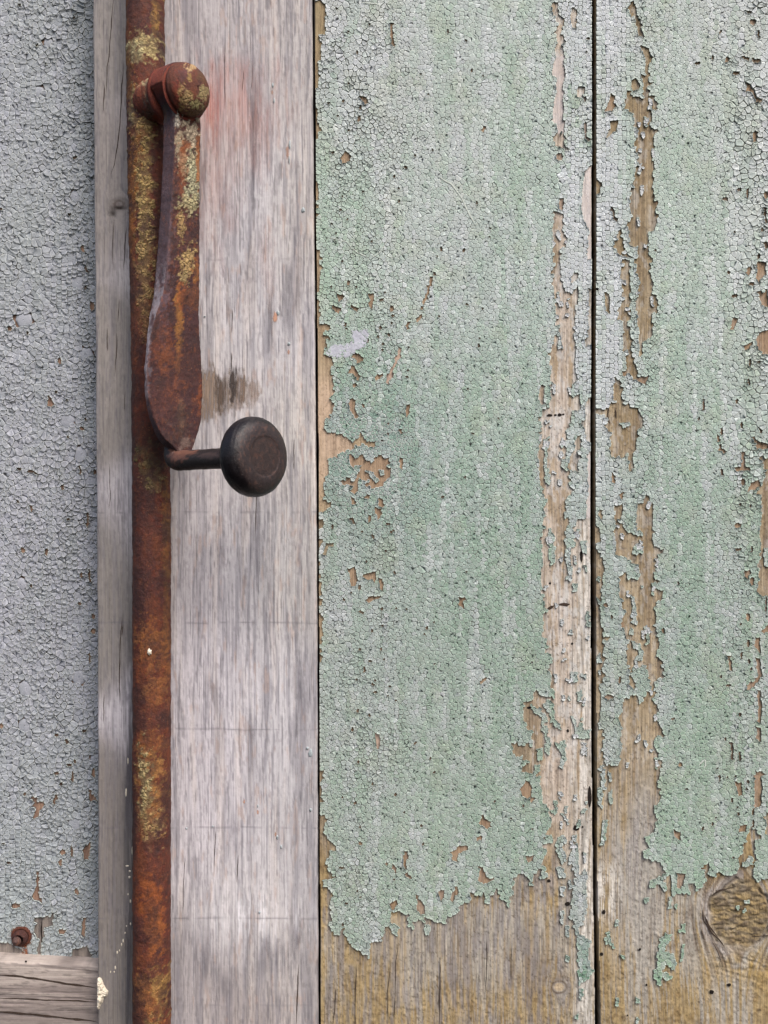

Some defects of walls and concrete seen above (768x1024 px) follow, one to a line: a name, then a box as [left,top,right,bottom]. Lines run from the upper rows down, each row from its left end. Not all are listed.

leakage [201,364,256,420]
peeling [315,0,768,1024]
peeling [24,759,76,822]
peeling [58,840,98,866]
peeling [0,936,23,953]
peeling [7,871,66,954]
peeling [73,918,93,957]
crack [701,887,733,964]